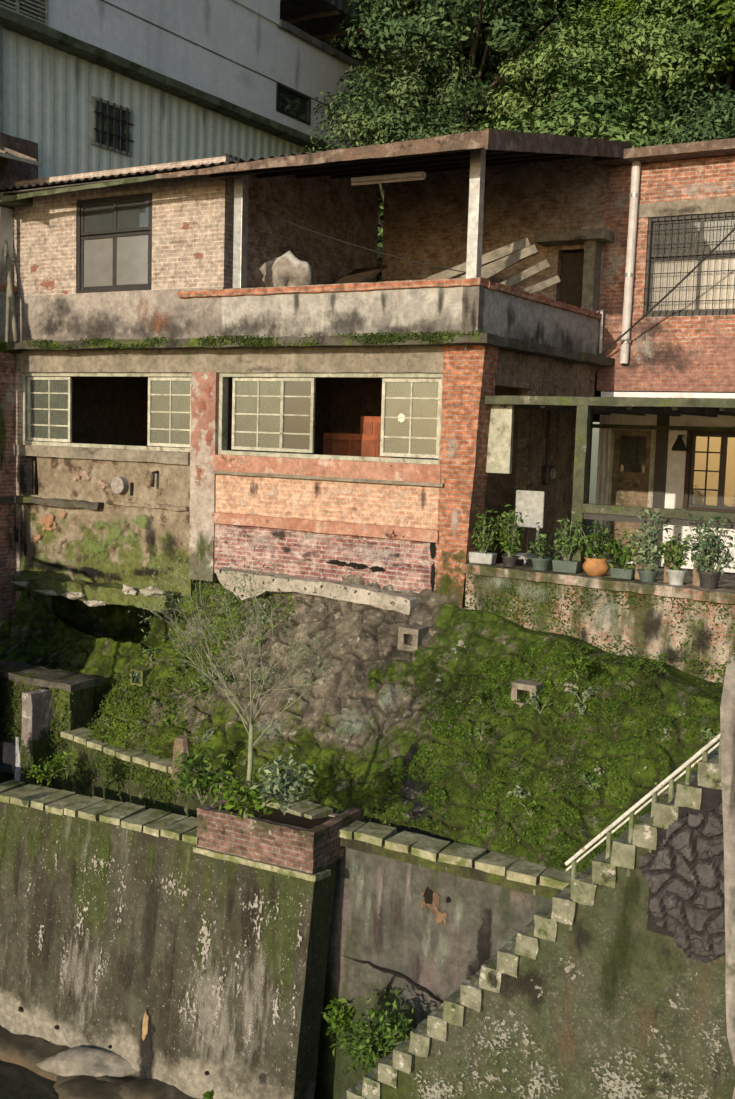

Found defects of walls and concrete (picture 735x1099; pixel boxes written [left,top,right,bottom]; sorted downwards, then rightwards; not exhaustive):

leakage [14,463,118,580]
leakage [146,527,172,560]
leakage [133,567,167,575]
peeling [13,581,105,607]
peeling [122,584,163,597]
leakage [644,610,661,639]
leakage [665,648,682,662]
leakage [697,630,709,650]
leakage [122,884,157,990]
crack [341,955,443,1003]
spalling [142,1009,150,1040]
leakage [133,1021,154,1080]